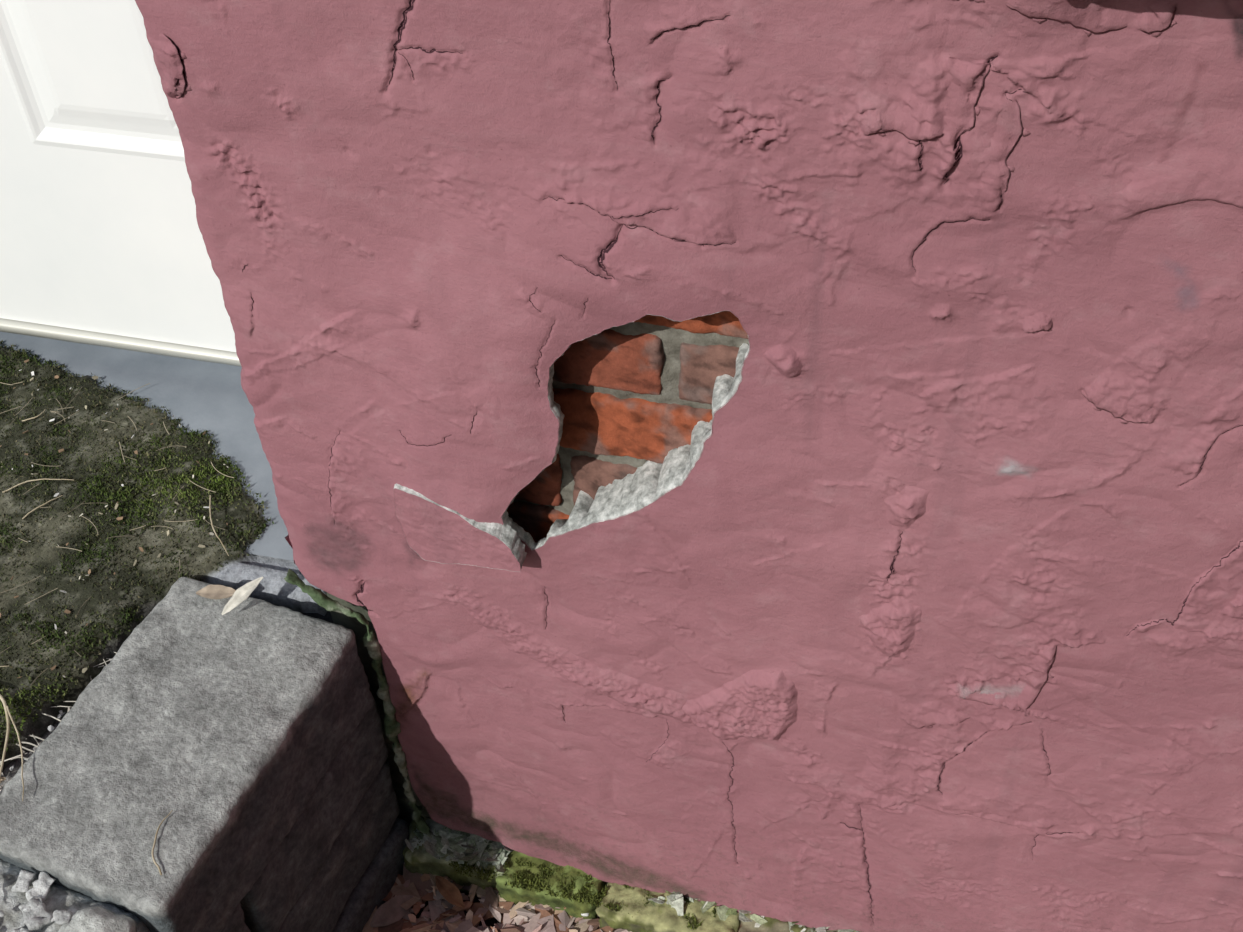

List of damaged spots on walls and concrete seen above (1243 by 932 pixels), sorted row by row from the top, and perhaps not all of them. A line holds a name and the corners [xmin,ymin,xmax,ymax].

crack [386,0,460,90]
crack [607,3,618,88]
crack [651,77,670,141]
crack [918,137,962,184]
crack [543,197,735,316]
crack [912,195,1003,272]
spalling [394,311,750,572]
crack [722,742,738,863]
crack [843,804,874,923]